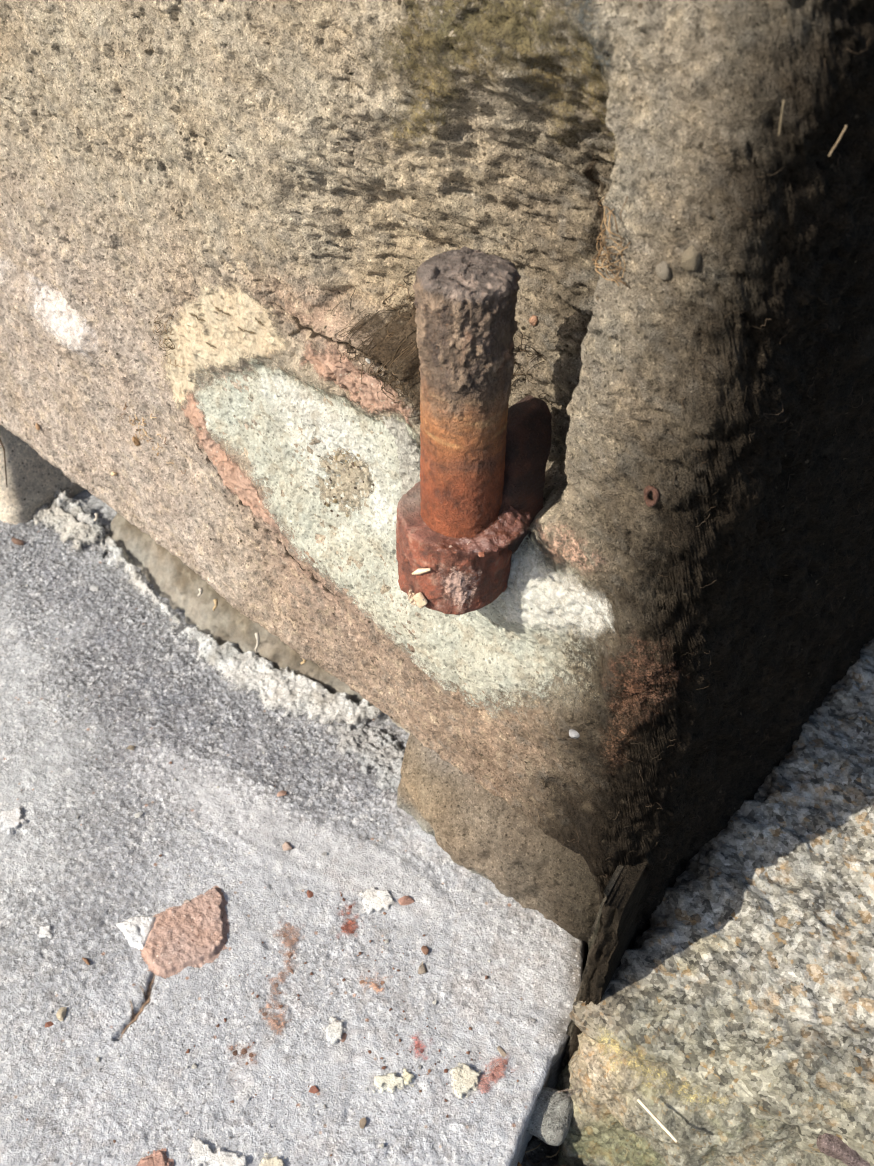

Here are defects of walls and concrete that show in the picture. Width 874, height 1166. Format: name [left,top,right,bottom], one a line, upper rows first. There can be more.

damp [378,0,615,145]
peeling [161,285,287,529]
peeling [301,342,412,426]
spalling [315,447,375,517]
rust [434,505,530,557]
rust [542,526,602,569]